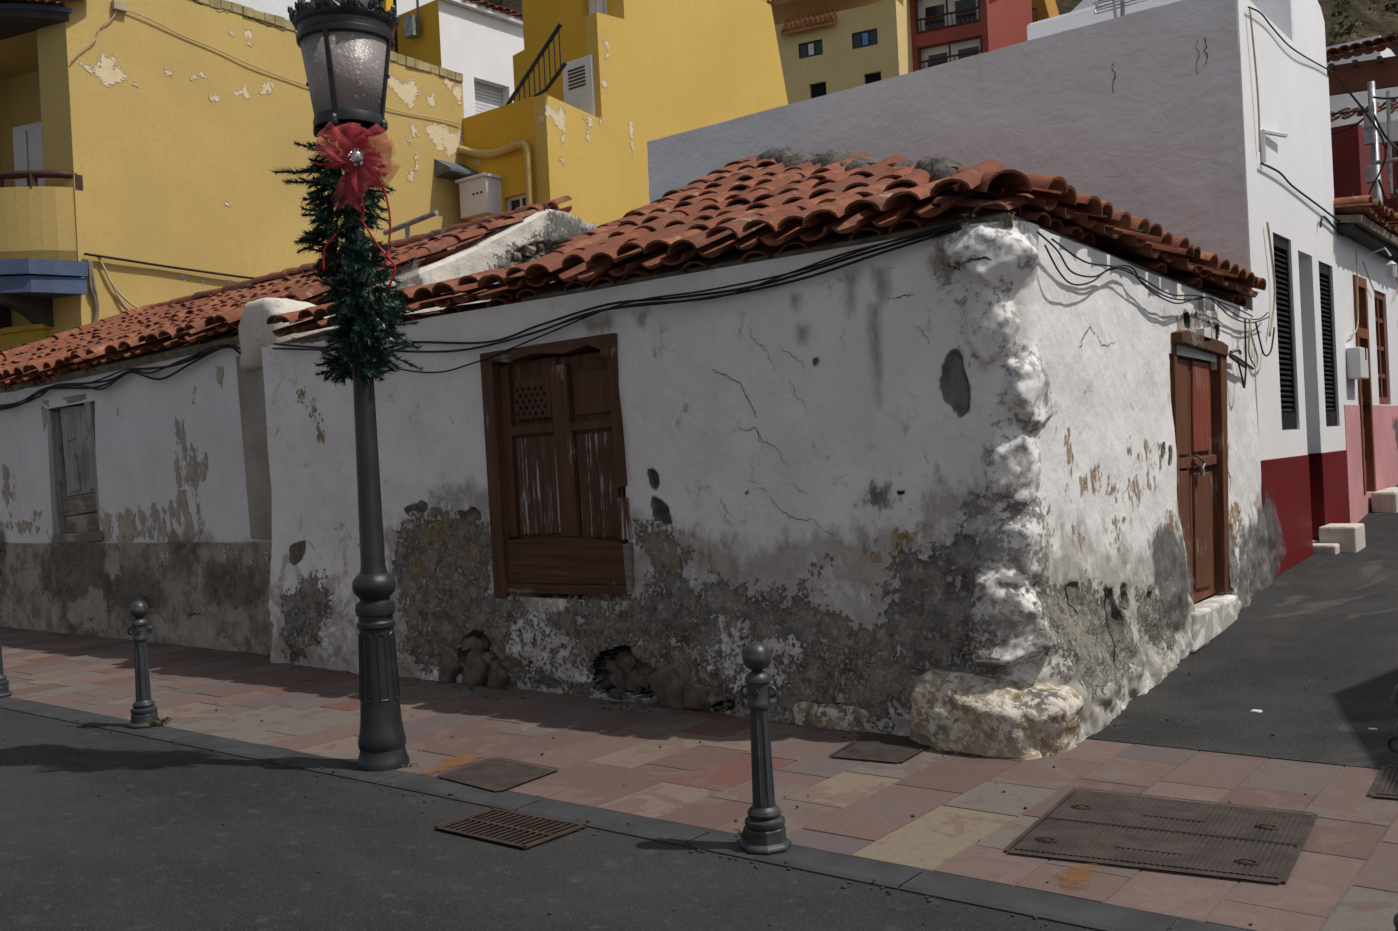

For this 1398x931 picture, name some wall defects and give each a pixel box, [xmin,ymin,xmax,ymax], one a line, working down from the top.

peeling [80,52,139,88]
peeling [387,70,483,182]
peeling [538,103,603,164]
peeling [0,464,53,542]
peeling [99,387,208,543]
crack [715,372,840,543]
peeling [1052,426,1173,552]
peeling [386,469,1006,734]
peeling [1020,523,1177,702]